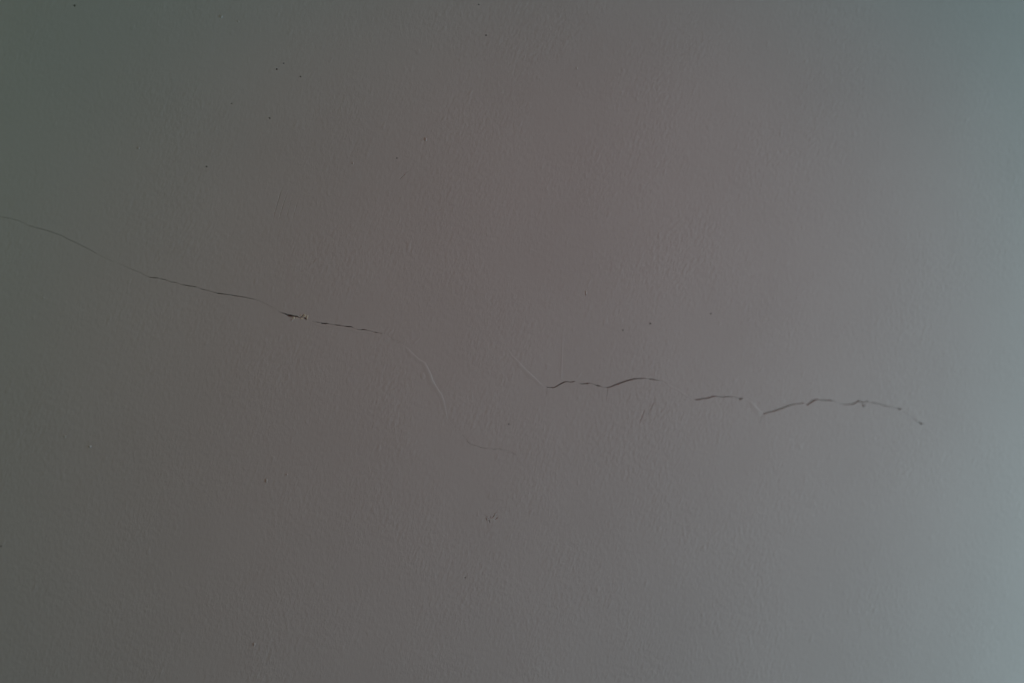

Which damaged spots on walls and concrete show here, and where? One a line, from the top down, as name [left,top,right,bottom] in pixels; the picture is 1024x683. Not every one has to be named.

crack [4,217,515,455]
crack [503,328,937,438]